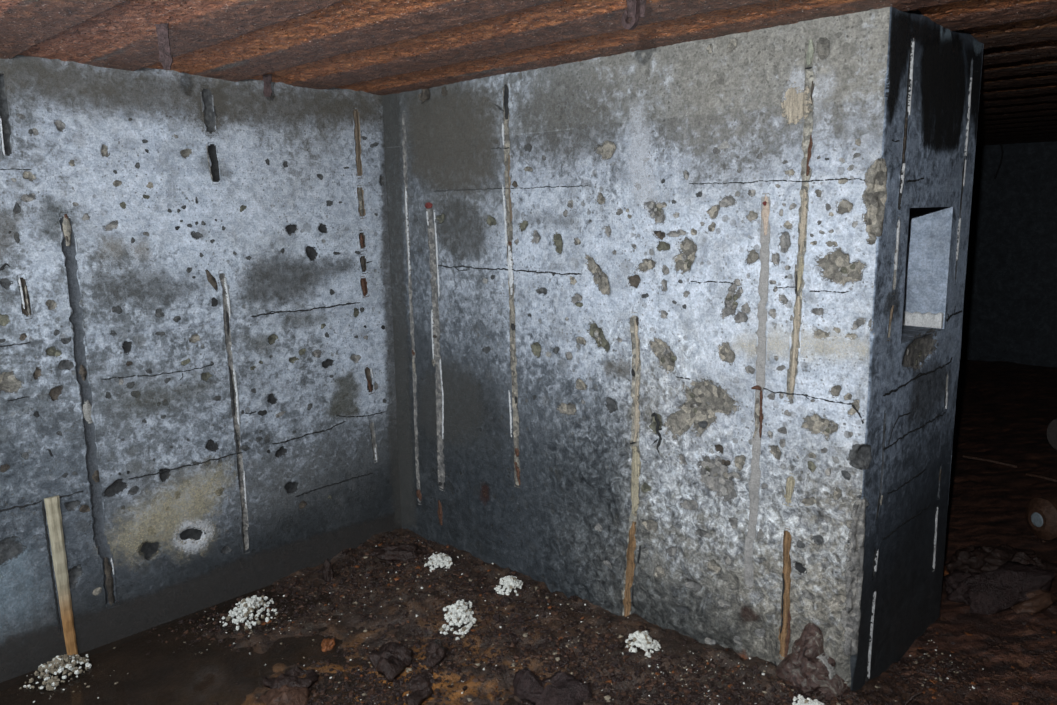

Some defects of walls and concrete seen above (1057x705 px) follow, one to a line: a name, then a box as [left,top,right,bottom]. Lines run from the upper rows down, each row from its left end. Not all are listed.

peeling [780,81,813,125]
leakage [886,12,982,151]
crack [689,177,865,185]
spalling [810,138,887,286]
crack [438,264,581,275]
leakage [0,59,509,683]
spalling [649,338,677,374]
spalling [649,378,739,440]
crack [883,358,952,450]
spalling [678,444,745,503]
spalling [680,500,698,510]
spalling [68,564,85,589]